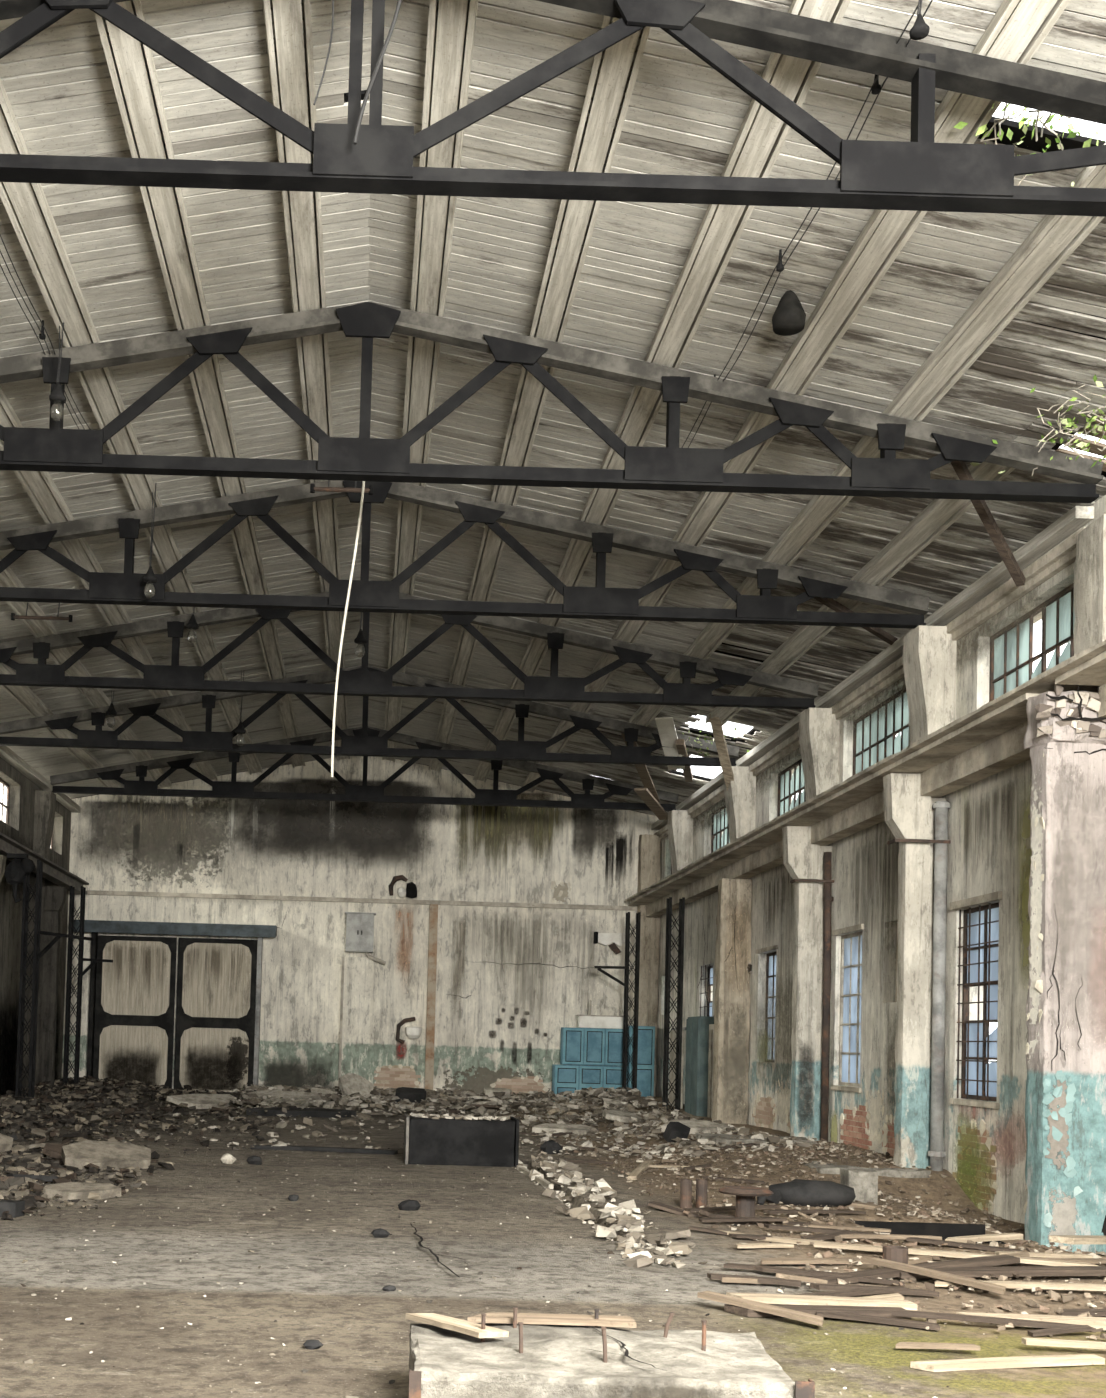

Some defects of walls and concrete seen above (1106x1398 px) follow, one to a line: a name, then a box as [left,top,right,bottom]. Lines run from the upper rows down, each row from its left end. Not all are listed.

spalling [1034,684,1106,738]
water stain [117,797,235,887]
water stain [1022,876,1030,968]
flaking render [752,1091,791,1133]
flaking render [840,1089,895,1157]
peeling [1026,1070,1083,1252]
crack [410,1223,465,1277]